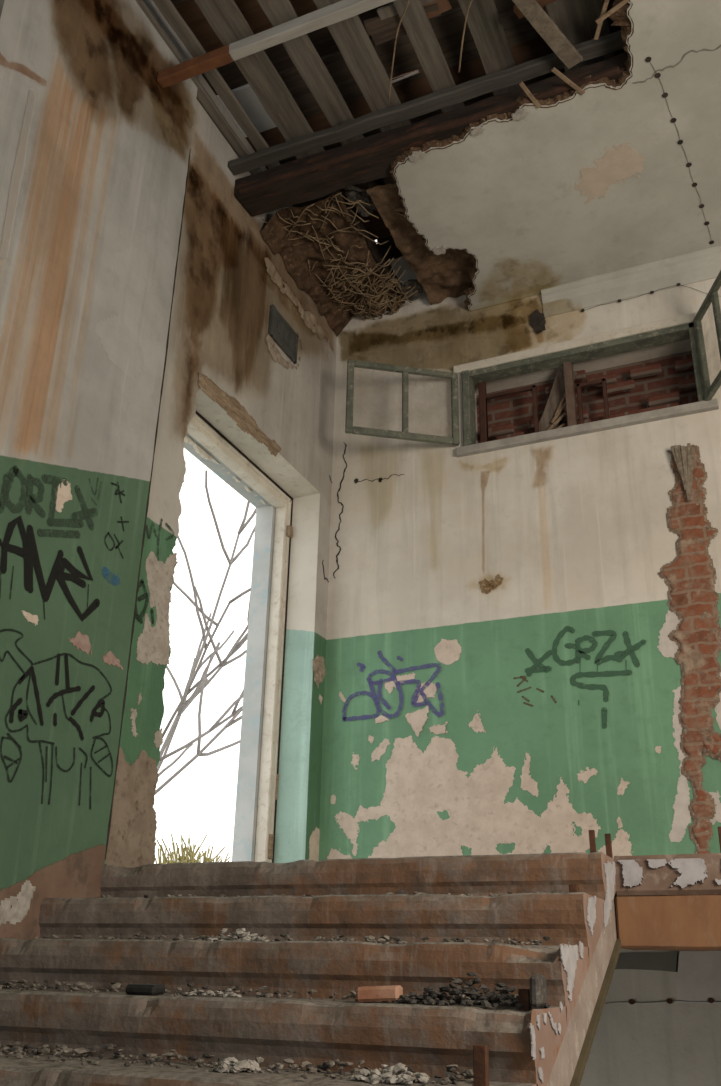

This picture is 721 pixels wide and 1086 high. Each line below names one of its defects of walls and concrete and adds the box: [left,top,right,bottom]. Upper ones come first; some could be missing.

leakage [87,0,158,92]
spalling [390,0,634,311]
crack [632,45,721,244]
peeling [136,551,178,666]
crack [322,443,404,582]
peeling [0,728,164,940]
peeling [130,692,142,737]
peeling [308,443,721,1083]